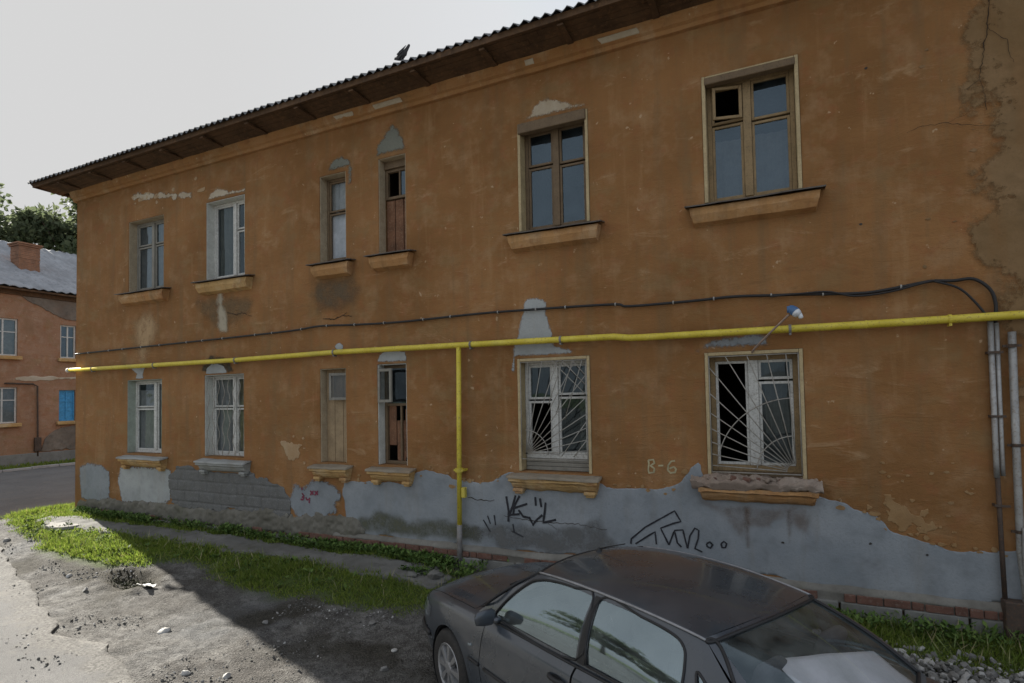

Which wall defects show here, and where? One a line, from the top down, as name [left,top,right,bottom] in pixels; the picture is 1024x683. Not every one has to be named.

crack [907,0,1014,133]
peeling [530,99,582,118]
peeling [131,177,205,204]
spalling [959,0,1024,339]
peeling [280,435,306,464]
flaking render [77,465,365,538]
peeling [862,461,957,545]